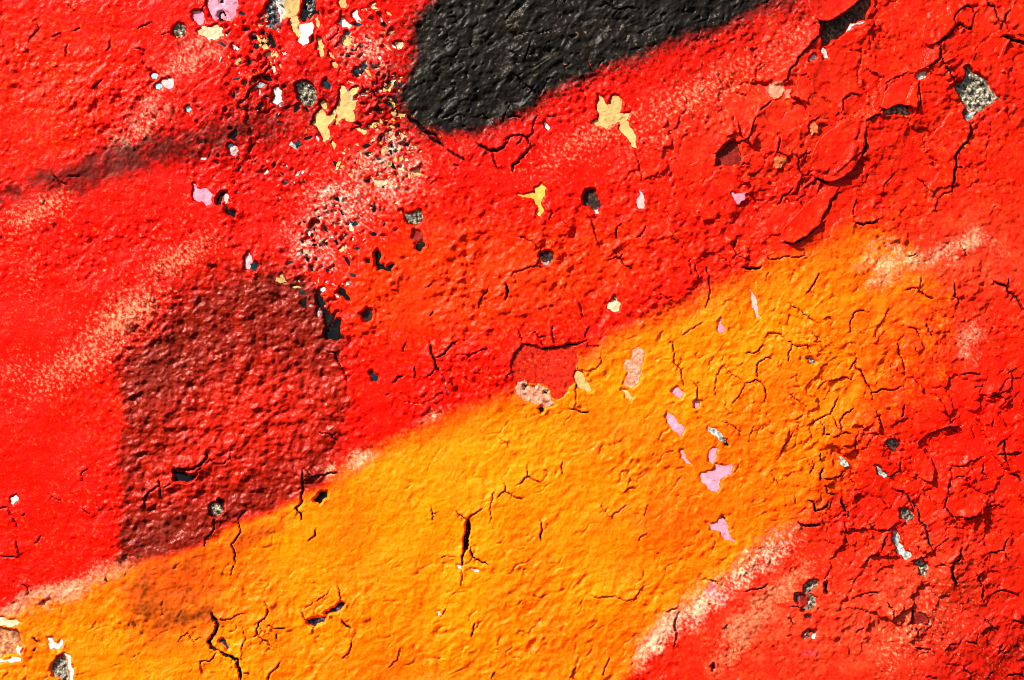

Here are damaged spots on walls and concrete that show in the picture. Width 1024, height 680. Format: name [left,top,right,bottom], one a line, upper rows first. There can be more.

crack [476,45,554,172]
peeling [592,95,637,148]
crack [863,1,1024,154]
spalling [955,67,999,121]
spalling [173,0,465,341]
crack [668,93,1024,678]
crack [295,468,337,541]
crack [431,461,563,581]
peeling [700,427,733,492]
spalling [0,617,22,663]
spalling [48,637,75,680]
crack [177,586,353,680]